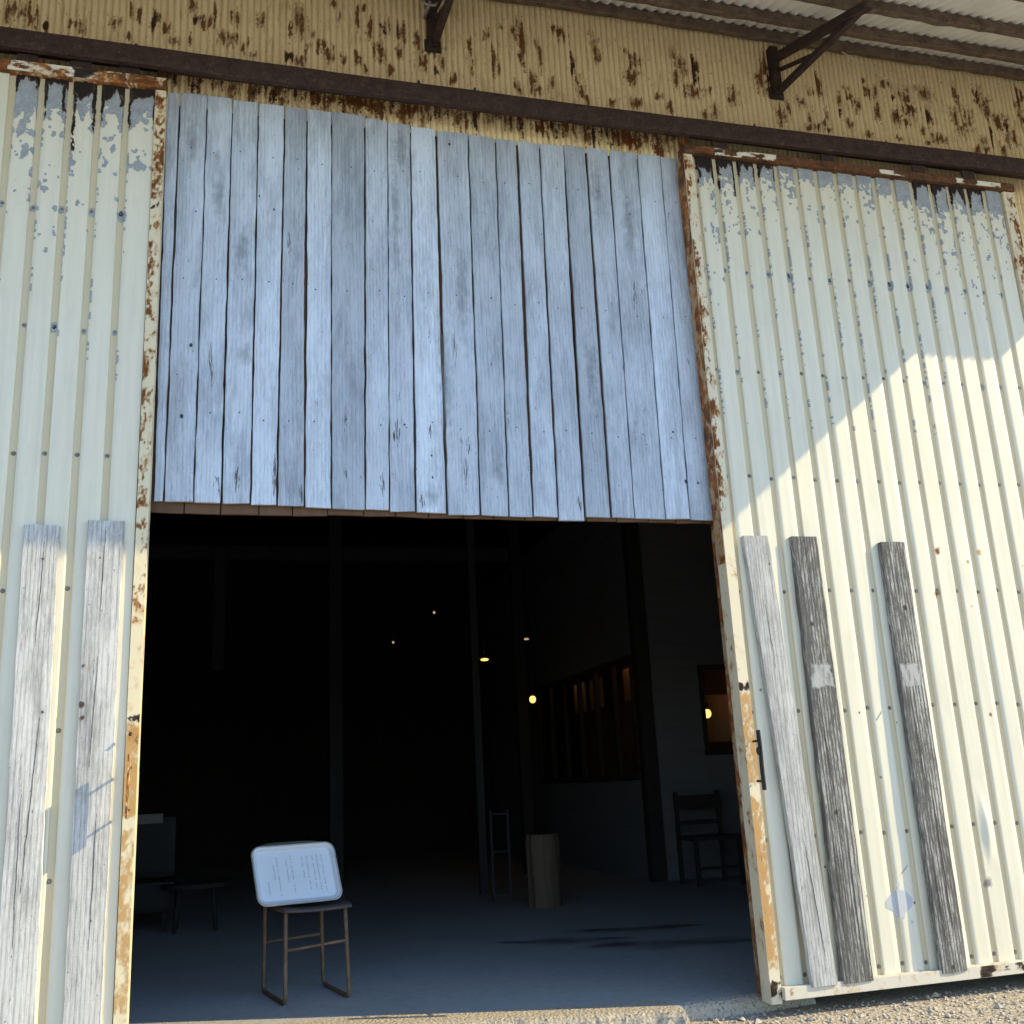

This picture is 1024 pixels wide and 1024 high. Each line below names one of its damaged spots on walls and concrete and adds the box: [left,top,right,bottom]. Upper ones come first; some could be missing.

peeling [0,60,155,257]
rust [108,0,257,57]
rust [15,67,678,209]
rust [285,4,457,86]
rust [684,147,775,227]
peeling [696,148,1011,330]
rust [777,71,1024,156]
peeling [82,279,93,360]
peeling [847,249,876,432]
peeling [915,309,932,404]
rust [114,714,140,1014]
rust [751,796,793,998]